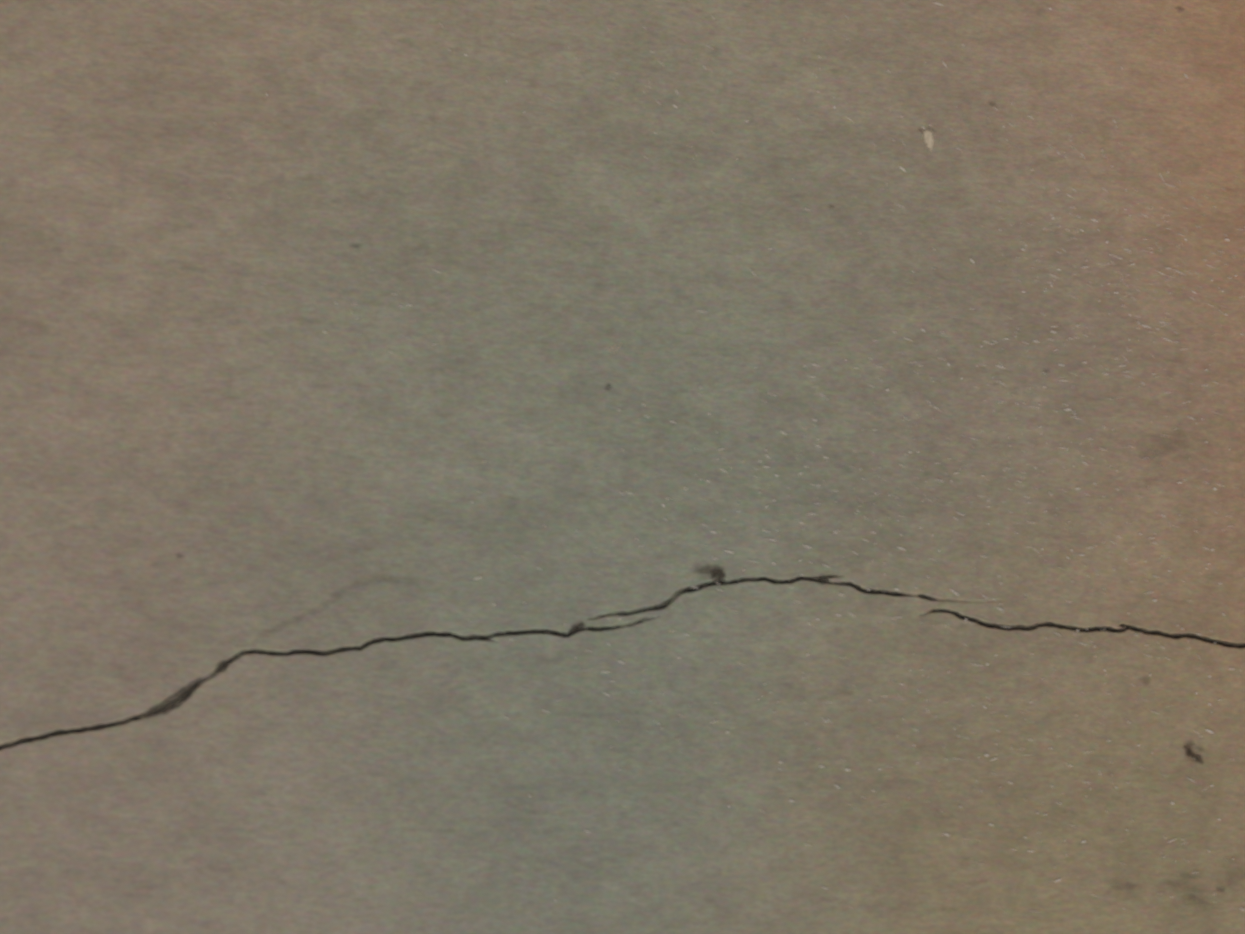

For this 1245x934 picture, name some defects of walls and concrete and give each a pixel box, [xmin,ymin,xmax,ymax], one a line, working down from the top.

crack [0,570,1245,749]